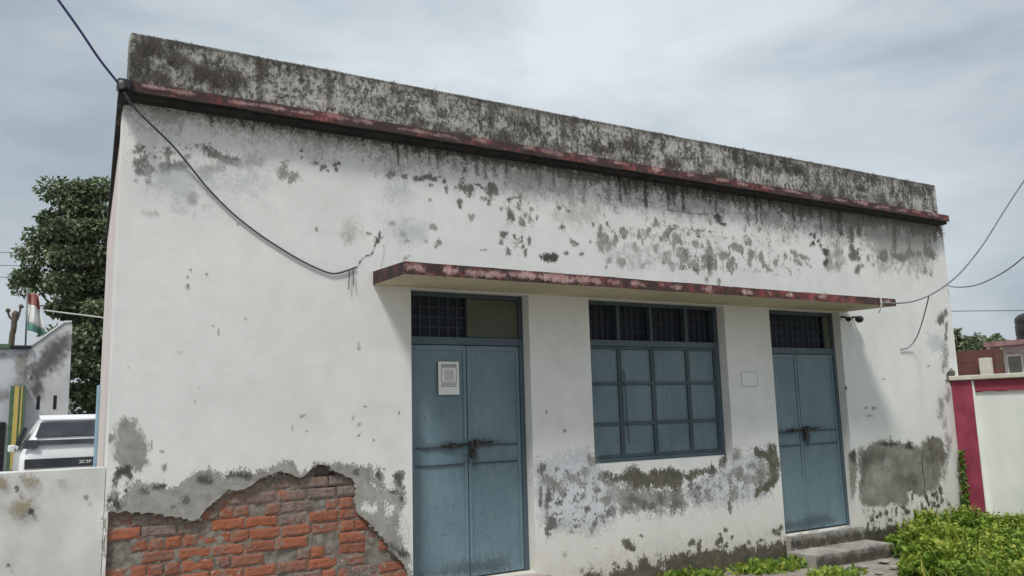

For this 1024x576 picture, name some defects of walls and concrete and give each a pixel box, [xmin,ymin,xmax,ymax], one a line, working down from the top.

damp [129,34,944,257]
crack [357,231,381,267]
peeling [386,171,831,292]
peeling [848,309,955,527]
spalling [99,416,413,576]
peeling [530,447,623,539]
spalling [621,534,643,552]
peeling [684,443,781,515]